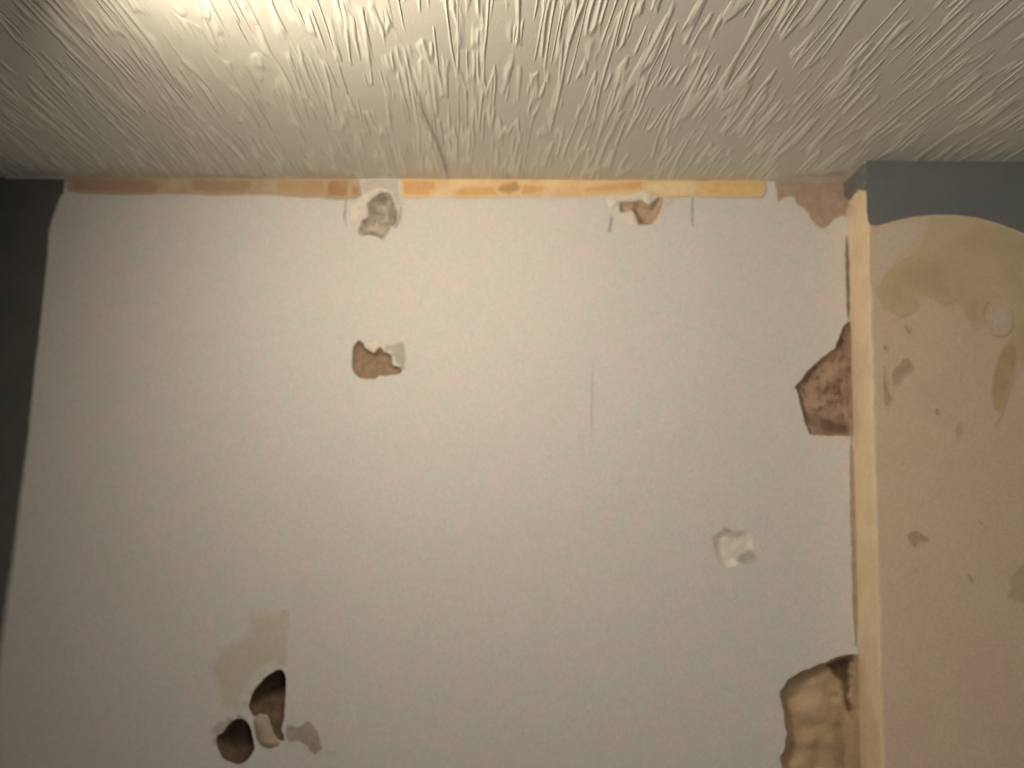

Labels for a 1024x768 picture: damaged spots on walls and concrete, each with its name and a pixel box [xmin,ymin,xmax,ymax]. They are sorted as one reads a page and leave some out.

spalling [343,179,404,245]
spalling [606,190,694,232]
peeling [773,181,848,231]
damp [871,215,1024,424]
spalling [335,336,408,379]
spalling [795,322,853,436]
spalling [711,527,759,568]
spalling [208,669,346,765]
spalling [779,654,861,768]